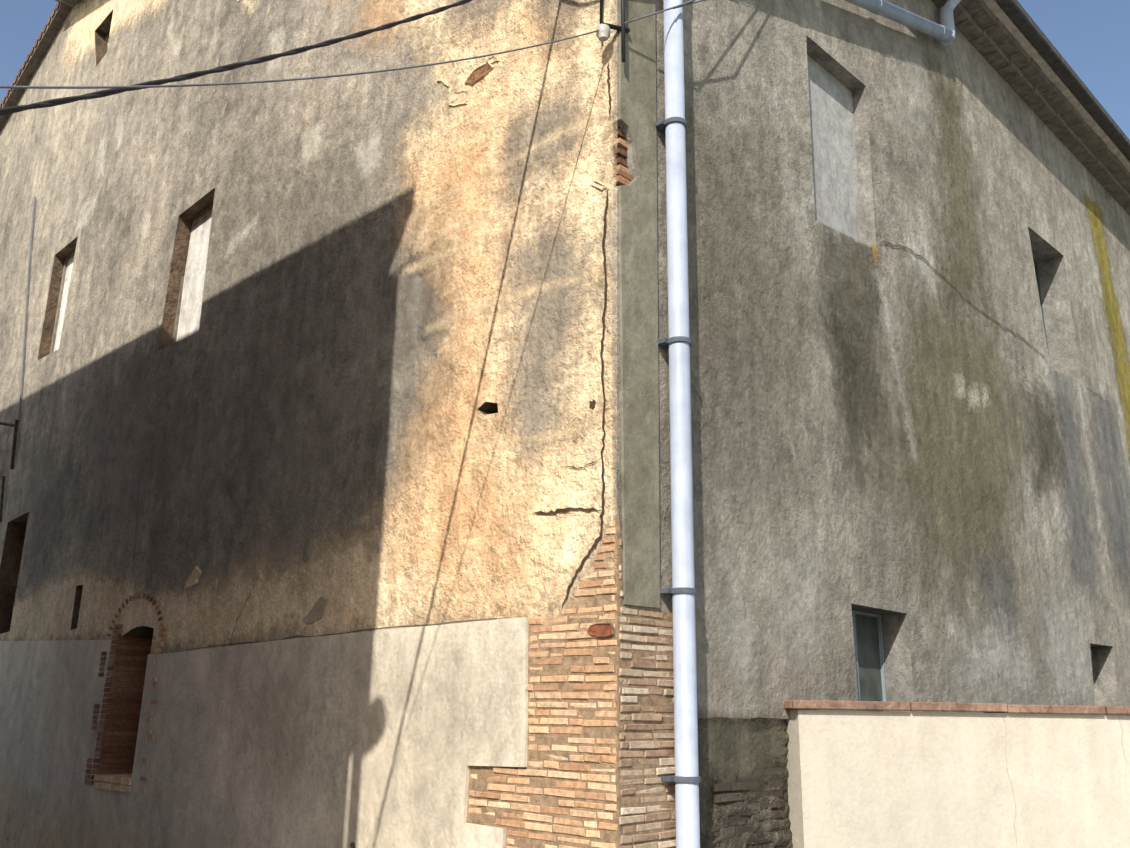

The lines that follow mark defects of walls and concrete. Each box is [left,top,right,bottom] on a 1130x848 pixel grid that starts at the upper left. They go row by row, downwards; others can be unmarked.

water stain [507,97,579,203]
crack [605,62,613,118]
water stain [88,154,429,549]
flaking render [0,0,635,654]
water stain [513,220,584,445]
water stain [820,224,884,461]
crack [880,241,1048,361]
water stain [1031,379,1091,579]
water stain [1095,405,1130,579]